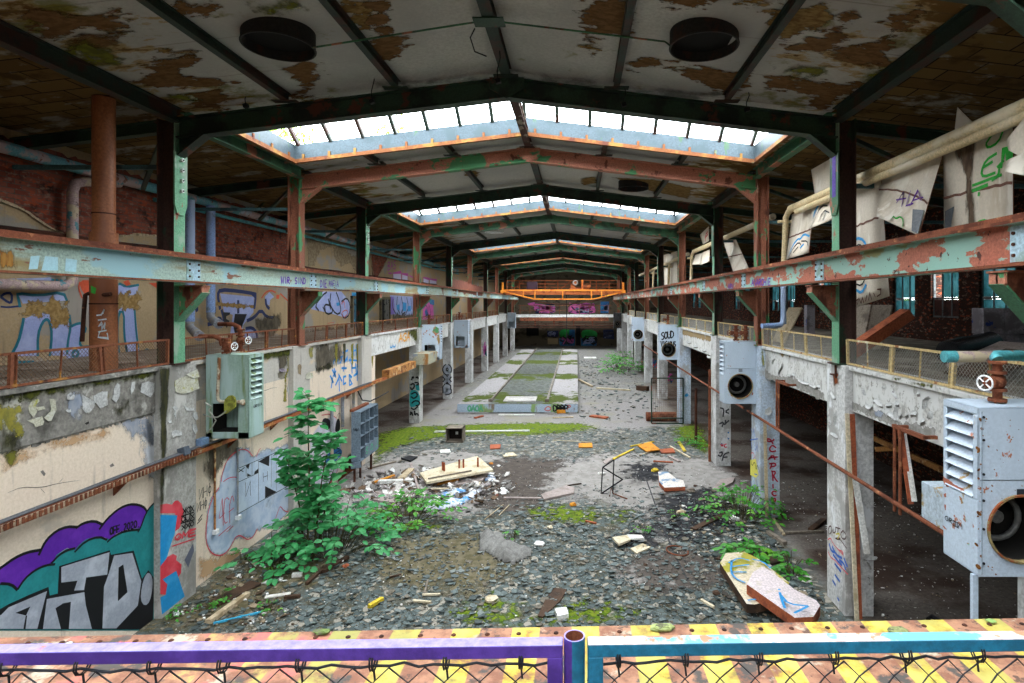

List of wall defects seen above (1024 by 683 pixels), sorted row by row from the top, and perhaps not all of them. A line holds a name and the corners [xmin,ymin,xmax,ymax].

peeling [17,7,135,49]
peeling [340,0,415,61]
peeling [659,0,718,11]
peeling [733,0,927,69]
peeling [130,48,242,112]
peeling [282,62,331,102]
peeling [625,57,865,110]
rust [0,250,14,268]
peeling [1,381,155,454]
peeling [168,369,200,438]
peeling [765,359,838,440]
peeling [852,386,936,435]